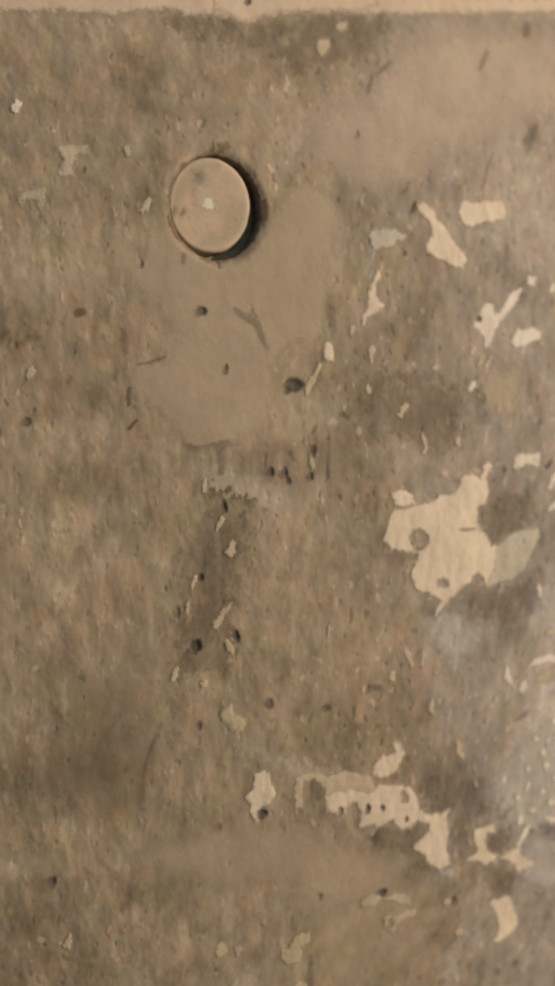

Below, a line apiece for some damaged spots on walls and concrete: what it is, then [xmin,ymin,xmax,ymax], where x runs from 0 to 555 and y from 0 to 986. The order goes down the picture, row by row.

peeling [417,202,467,269]
peeling [458,200,506,227]
peeling [470,275,537,369]
peeling [511,327,542,348]
peeling [383,461,539,616]
peeling [245,770,276,822]
peeling [295,740,450,869]
peeling [489,895,518,943]